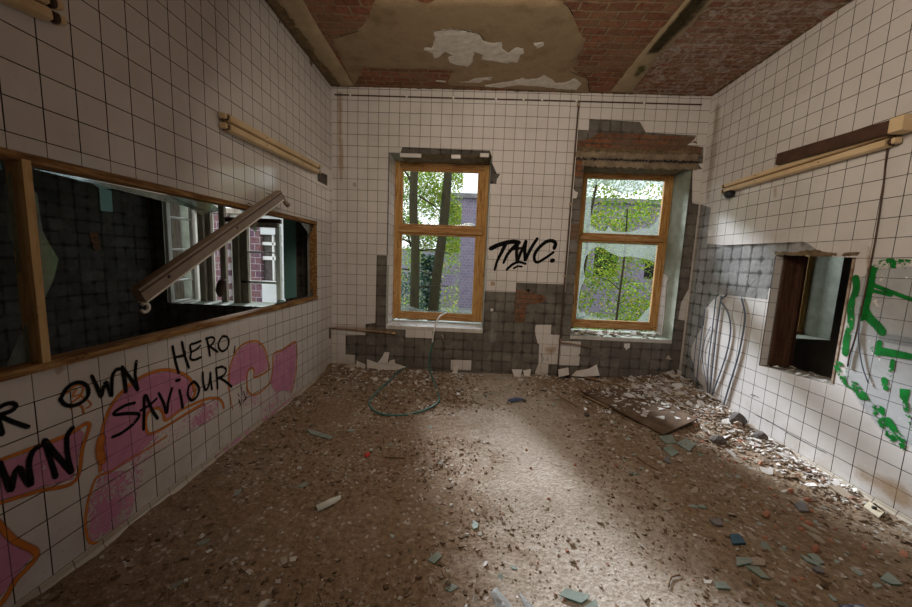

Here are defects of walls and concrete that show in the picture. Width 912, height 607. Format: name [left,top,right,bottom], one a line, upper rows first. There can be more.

peeling [424,29,524,67]
peeling [399,75,582,93]
spalling [345,119,819,390]